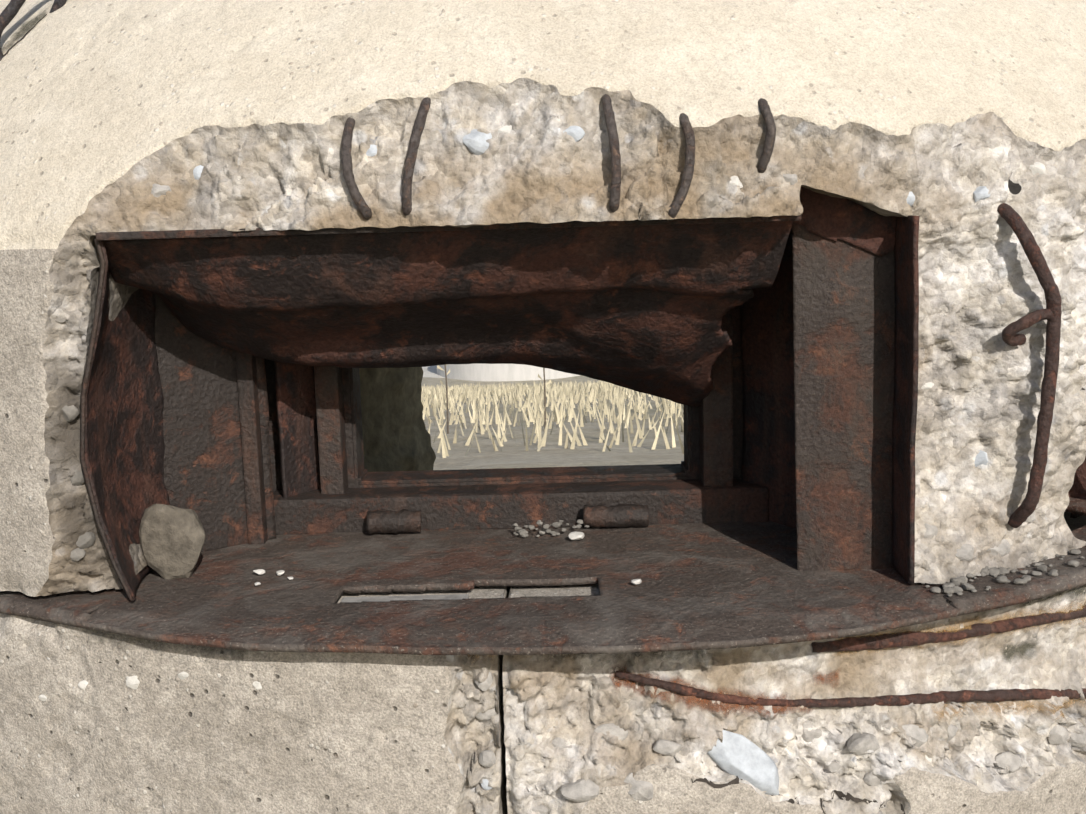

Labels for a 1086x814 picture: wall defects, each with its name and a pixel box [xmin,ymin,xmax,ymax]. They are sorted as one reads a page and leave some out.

spalling [35,78,1086,597]
corrosion [613,674,806,714]
spalling [444,585,1086,814]